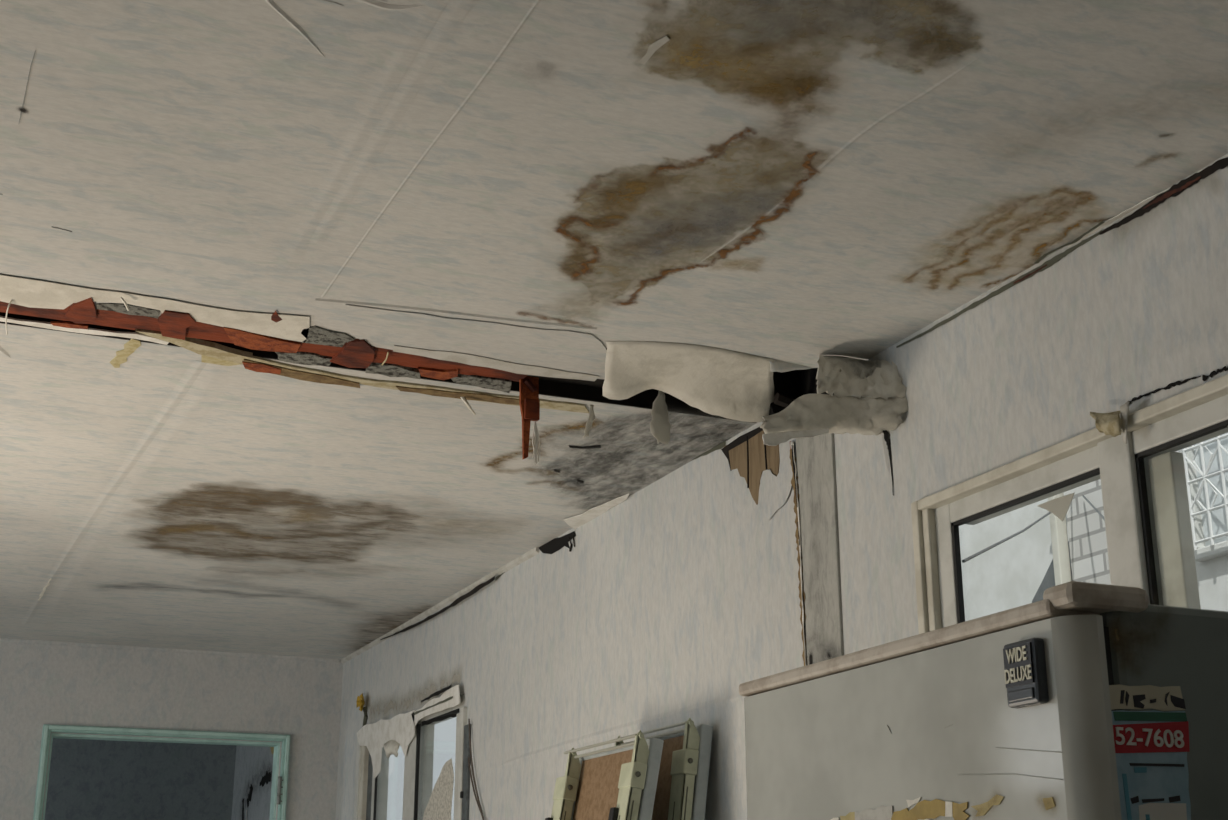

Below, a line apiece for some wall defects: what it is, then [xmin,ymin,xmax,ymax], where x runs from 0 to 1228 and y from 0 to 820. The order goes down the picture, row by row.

leakage [639,0,980,113]
leakage [555,128,819,305]
leakage [931,190,1103,289]
crack [896,155,1228,348]
crack [1129,366,1228,405]
mould [486,421,659,507]
leakage [143,487,408,563]